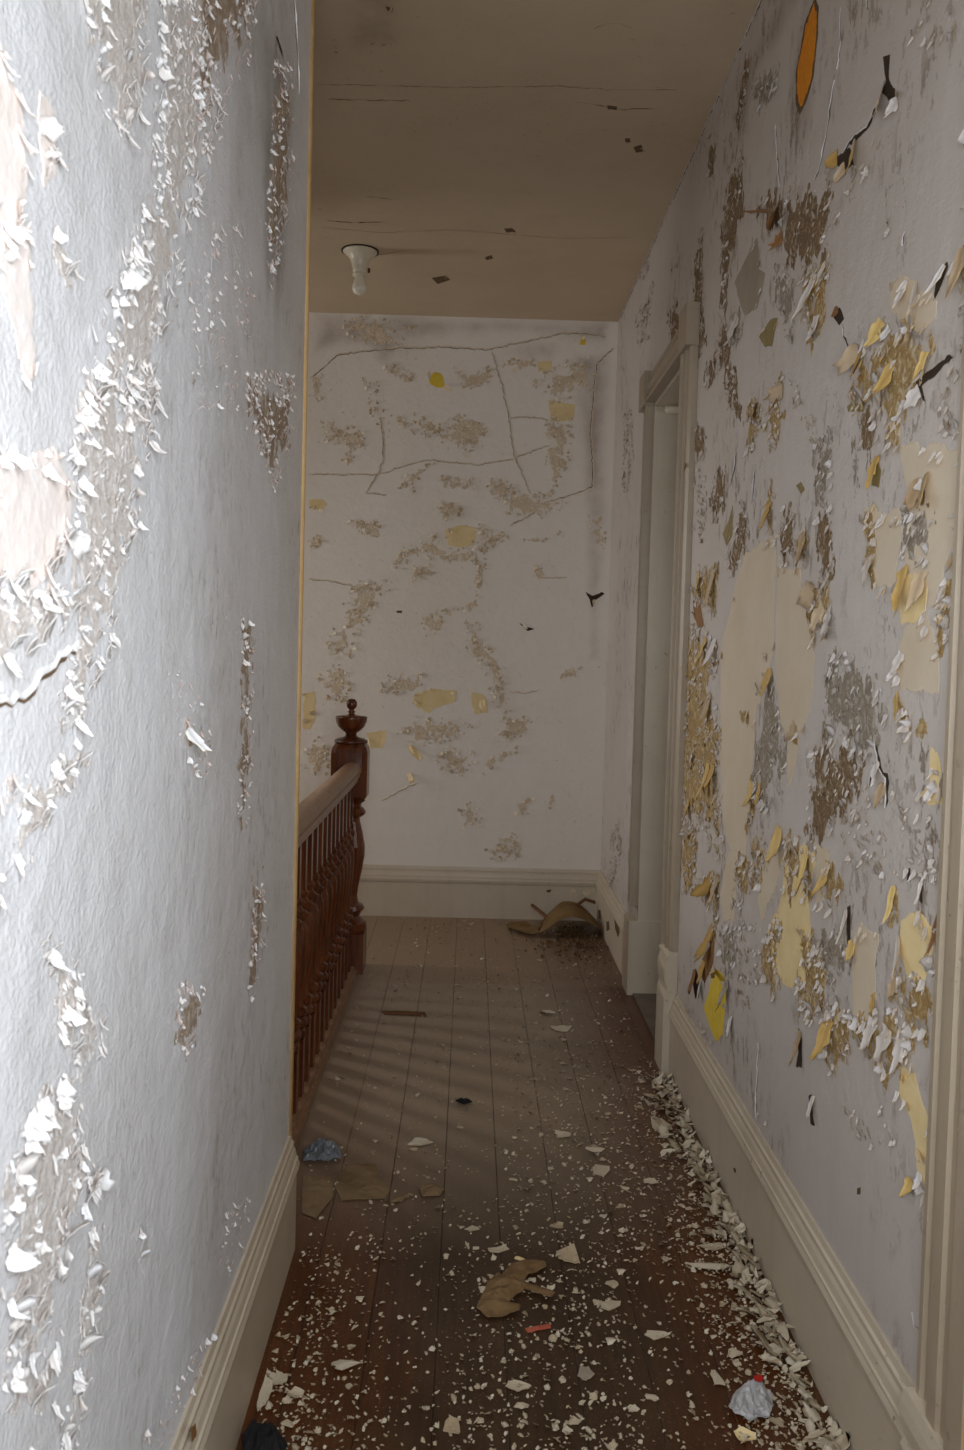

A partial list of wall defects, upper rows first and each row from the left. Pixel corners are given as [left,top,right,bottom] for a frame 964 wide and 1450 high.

spalling [733,0,819,133]
crack [775,0,882,188]
peeling [881,97,898,119]
crack [294,0,762,526]
peeling [847,245,964,662]
peeling [300,335,596,783]
peeling [634,138,941,1112]
peeling [484,795,555,862]
peeling [174,978,206,1061]
peeling [247,866,267,1003]
peeling [0,931,116,1450]
peeling [898,1130,927,1208]